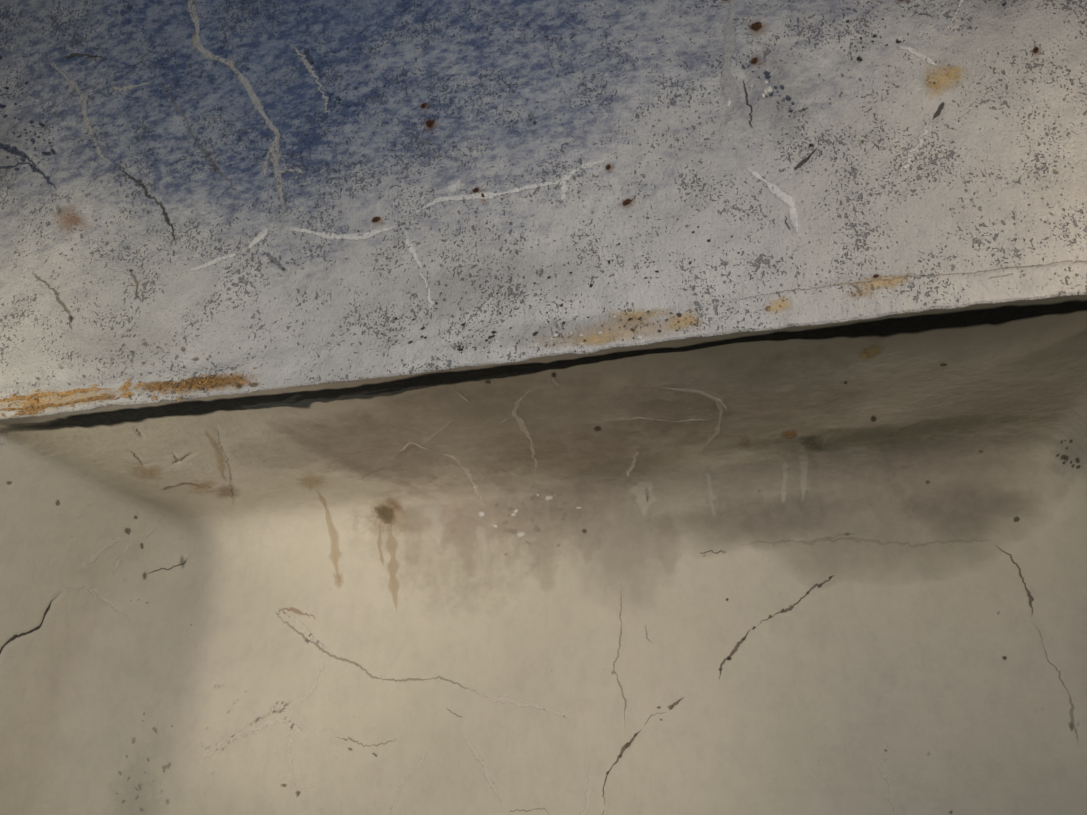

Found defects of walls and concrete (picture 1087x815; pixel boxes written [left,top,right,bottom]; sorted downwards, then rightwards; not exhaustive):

crack [898,0,964,66]
crack [0,143,55,187]
crack [49,53,176,244]
crack [187,0,610,310]
crack [898,102,945,174]
rust [0,373,257,417]
rust [378,507,393,523]
crack [143,559,186,578]
crack [998,547,1033,613]
crack [0,584,127,654]
crack [719,575,834,678]
crack [602,697,684,815]